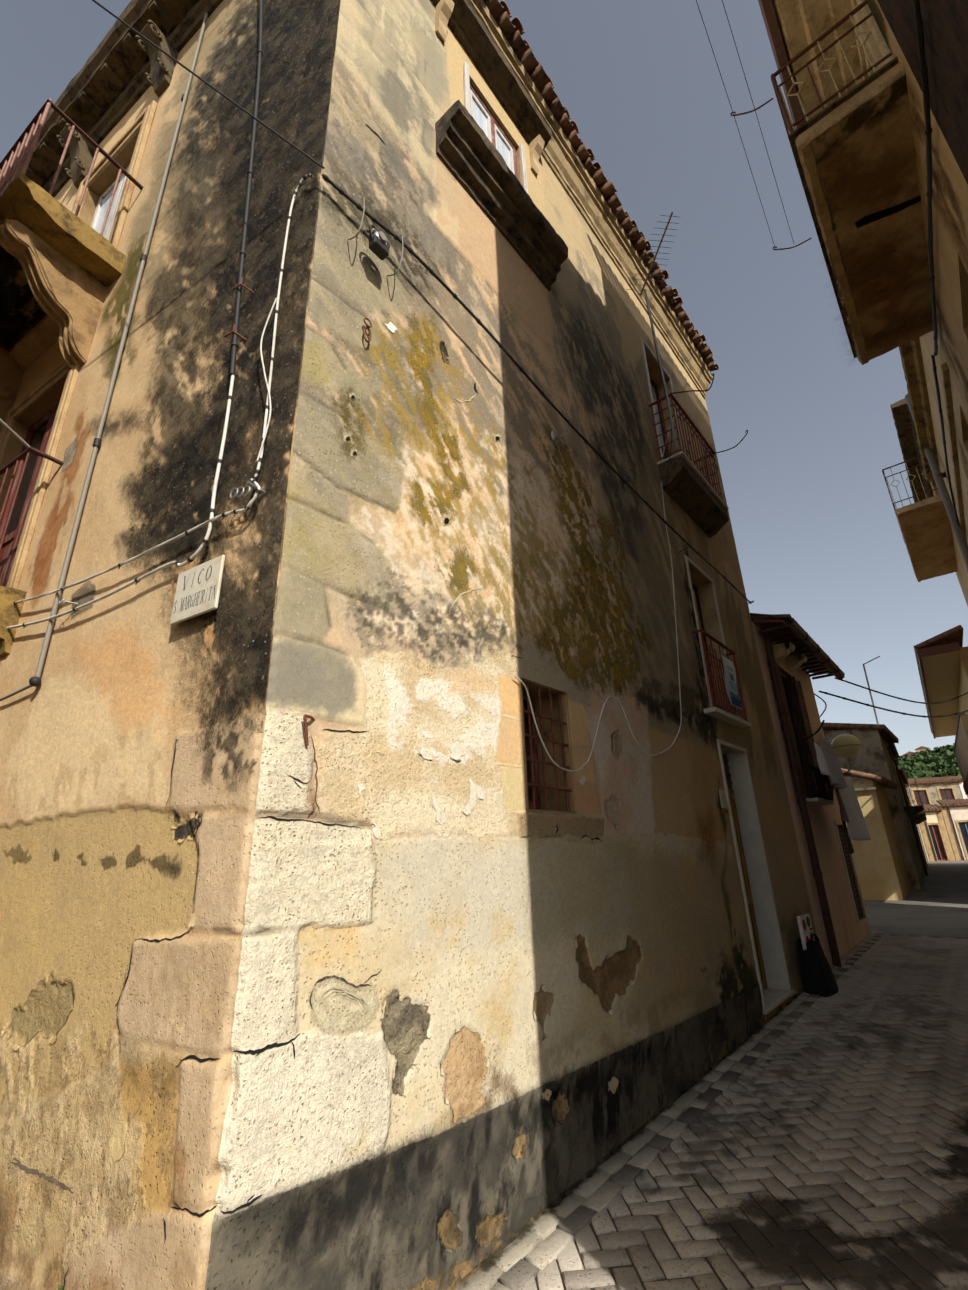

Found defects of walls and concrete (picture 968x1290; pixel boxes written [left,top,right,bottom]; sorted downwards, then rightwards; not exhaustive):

leakage [91,0,440,781]
leakage [566,312,646,555]
leakage [358,590,521,660]
spalling [77,845,166,872]
spalling [171,812,202,843]
spalling [1,975,74,1051]
crack [175,971,380,1067]
spalling [381,989,432,1096]
spalling [440,1026,490,1123]
spalling [533,985,555,1043]
spalling [574,934,642,1016]
crack [10,1158,73,1193]